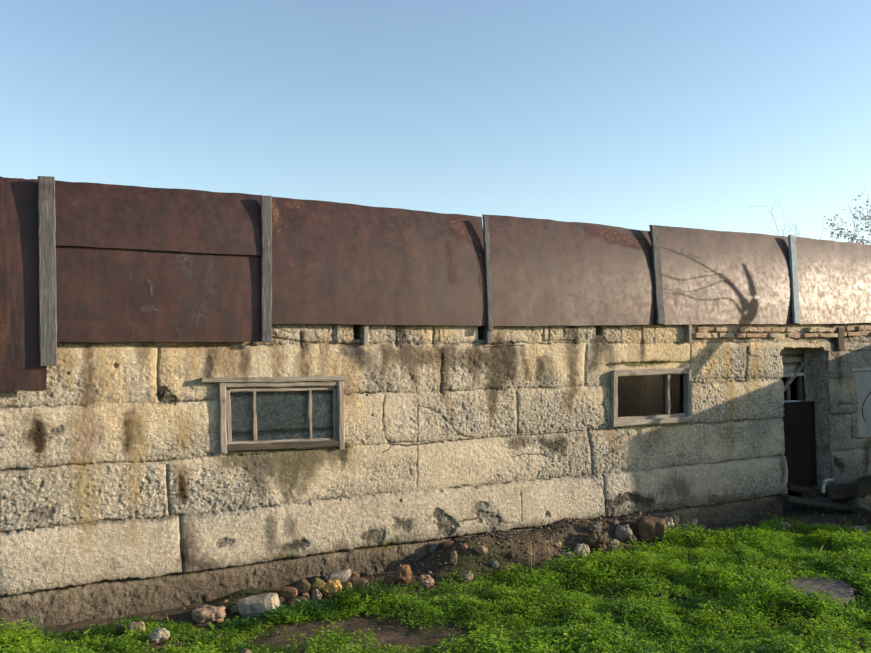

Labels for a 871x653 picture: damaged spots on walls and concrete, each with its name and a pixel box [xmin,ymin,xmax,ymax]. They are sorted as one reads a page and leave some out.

damp [343,343,372,366]
damp [382,325,517,415]
crack [382,374,480,484]
damp [267,516,298,558]